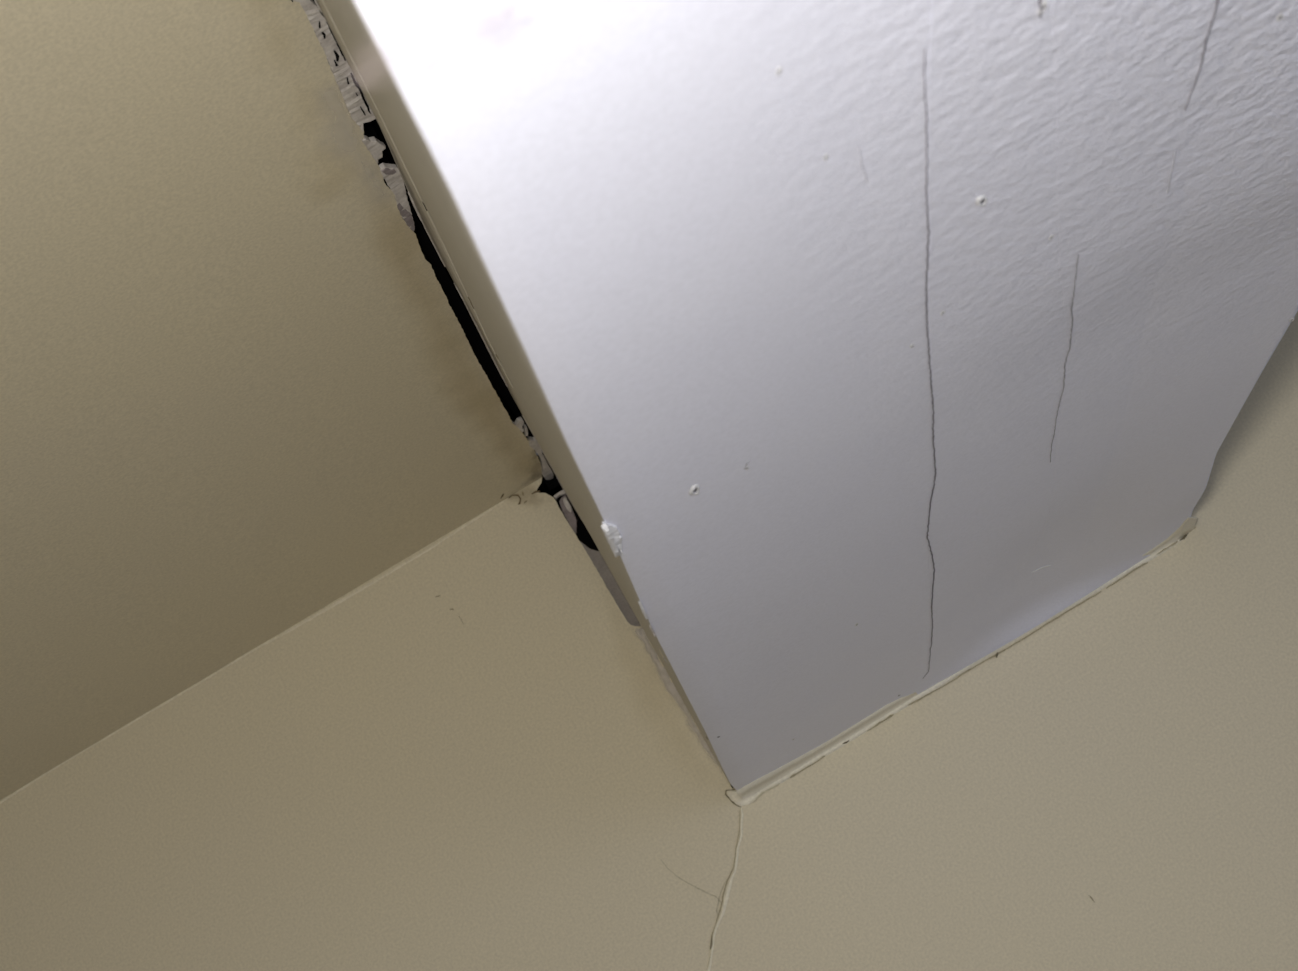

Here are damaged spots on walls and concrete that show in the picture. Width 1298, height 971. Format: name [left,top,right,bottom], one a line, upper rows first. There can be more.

crack [661,48,1197,971]
crack [1185,0,1219,111]